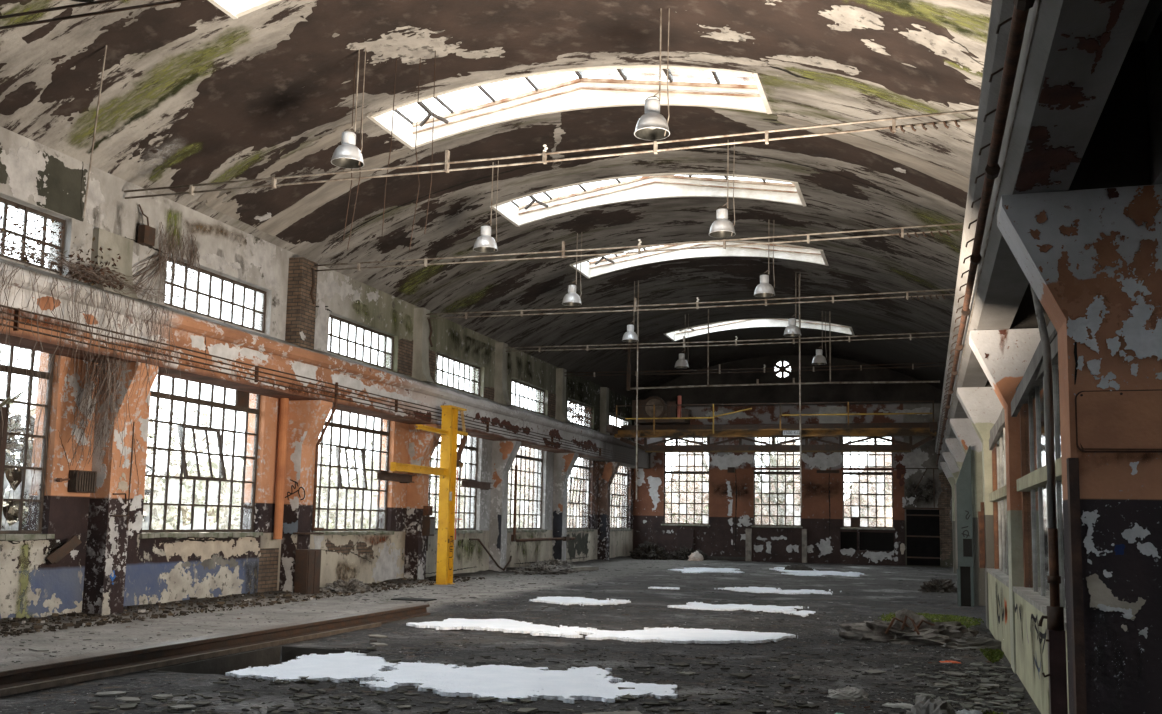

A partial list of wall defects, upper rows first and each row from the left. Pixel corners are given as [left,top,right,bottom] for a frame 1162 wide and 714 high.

peeling [0,0,217,124]
peeling [0,142,49,207]
peeling [129,0,981,355]
peeling [188,335,318,390]
peeling [331,373,440,422]
peeling [0,540,82,618]
peeling [64,374,151,616]
peeling [138,497,299,605]
peeling [313,536,424,583]
peeling [637,469,662,523]
peeling [709,452,905,577]
peeling [1081,510,1161,578]